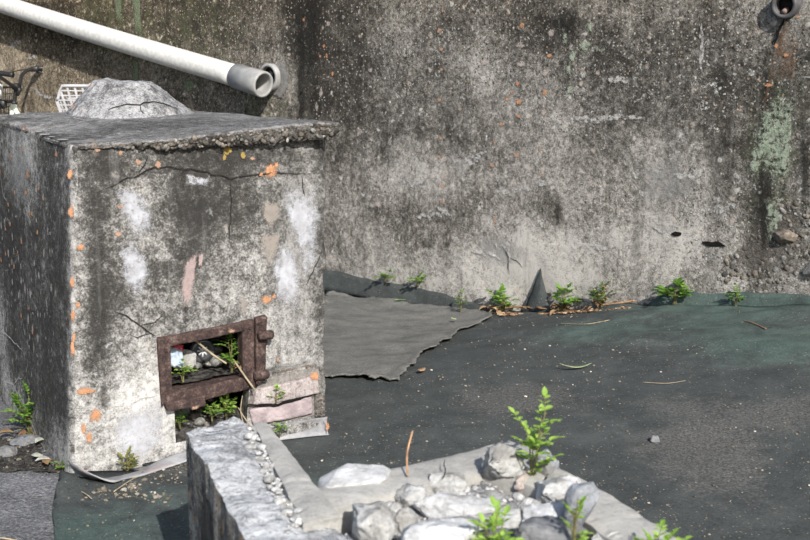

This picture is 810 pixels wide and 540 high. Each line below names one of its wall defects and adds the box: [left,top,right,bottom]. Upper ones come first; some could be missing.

crack [108,101,172,114]
damp [296,18,328,120]
damp [751,97,793,241]
peeling [182,254,203,302]